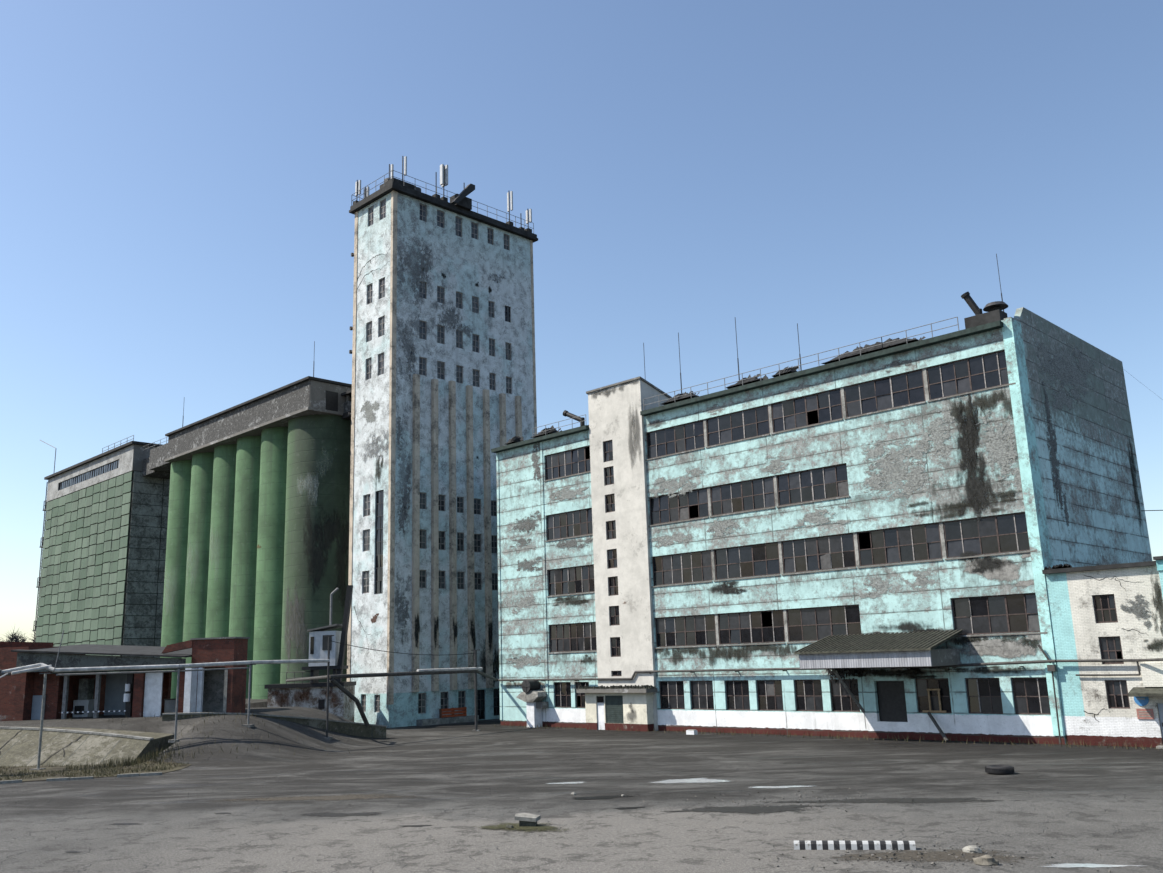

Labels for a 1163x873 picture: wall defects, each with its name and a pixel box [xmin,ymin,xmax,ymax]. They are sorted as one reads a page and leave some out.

peeling [361,401,380,423]
water stain [629,412,660,463]
peeling [861,409,955,502]
water stain [908,391,1016,519]
water stain [304,512,349,607]
peeling [1120,594,1151,629]